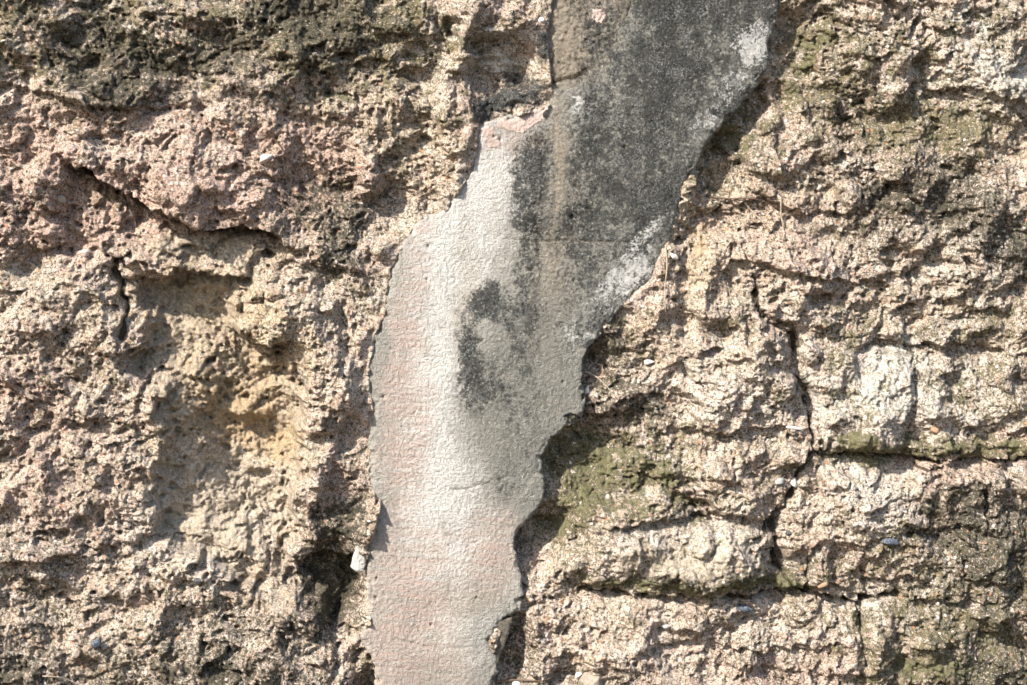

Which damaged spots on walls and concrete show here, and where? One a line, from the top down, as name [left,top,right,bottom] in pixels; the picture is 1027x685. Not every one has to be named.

water stain [455,0,783,455]
crack [752,283,766,318]
crack [787,331,801,350]
crack [903,344,921,391]
crack [886,453,965,472]
crack [999,454,1024,465]
crack [579,389,889,628]